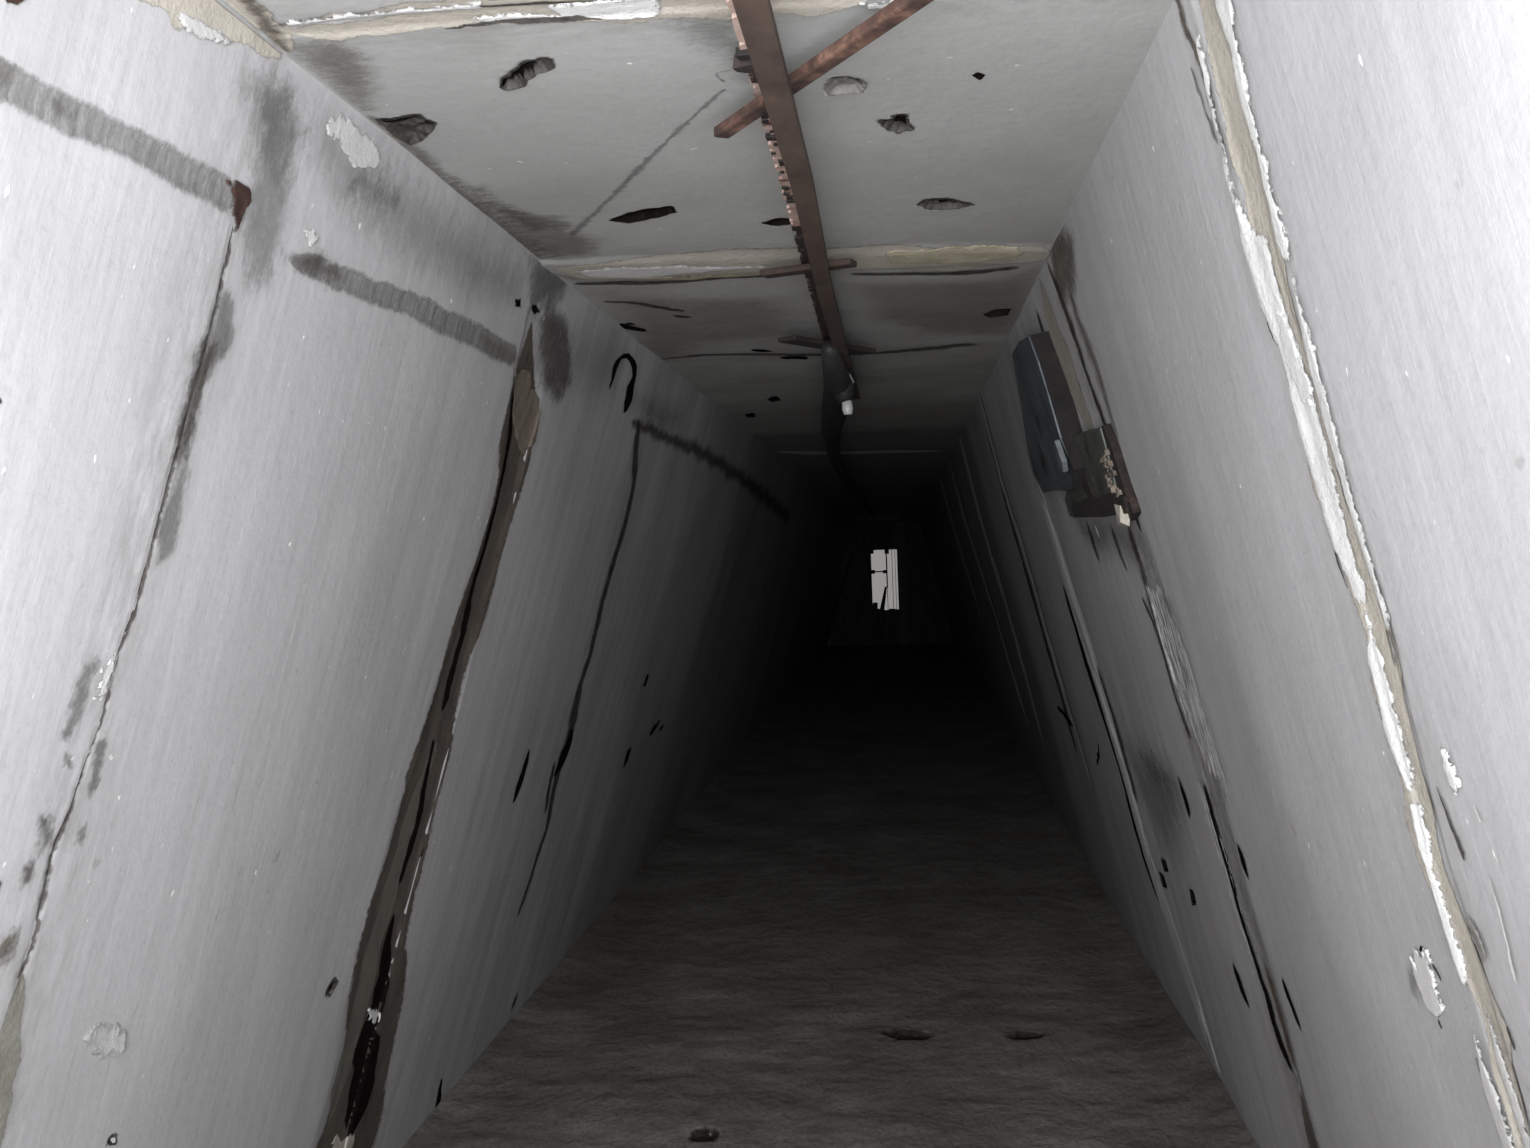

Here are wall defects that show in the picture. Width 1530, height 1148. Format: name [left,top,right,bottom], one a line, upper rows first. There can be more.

peeling [859,0,894,9]
crack [0,227,233,1145]
crack [375,372,519,1005]
crack [513,301,975,916]
peeling [1196,0,1485,1029]
crack [434,1079,442,1108]
peeling [1466,1006,1530,1148]